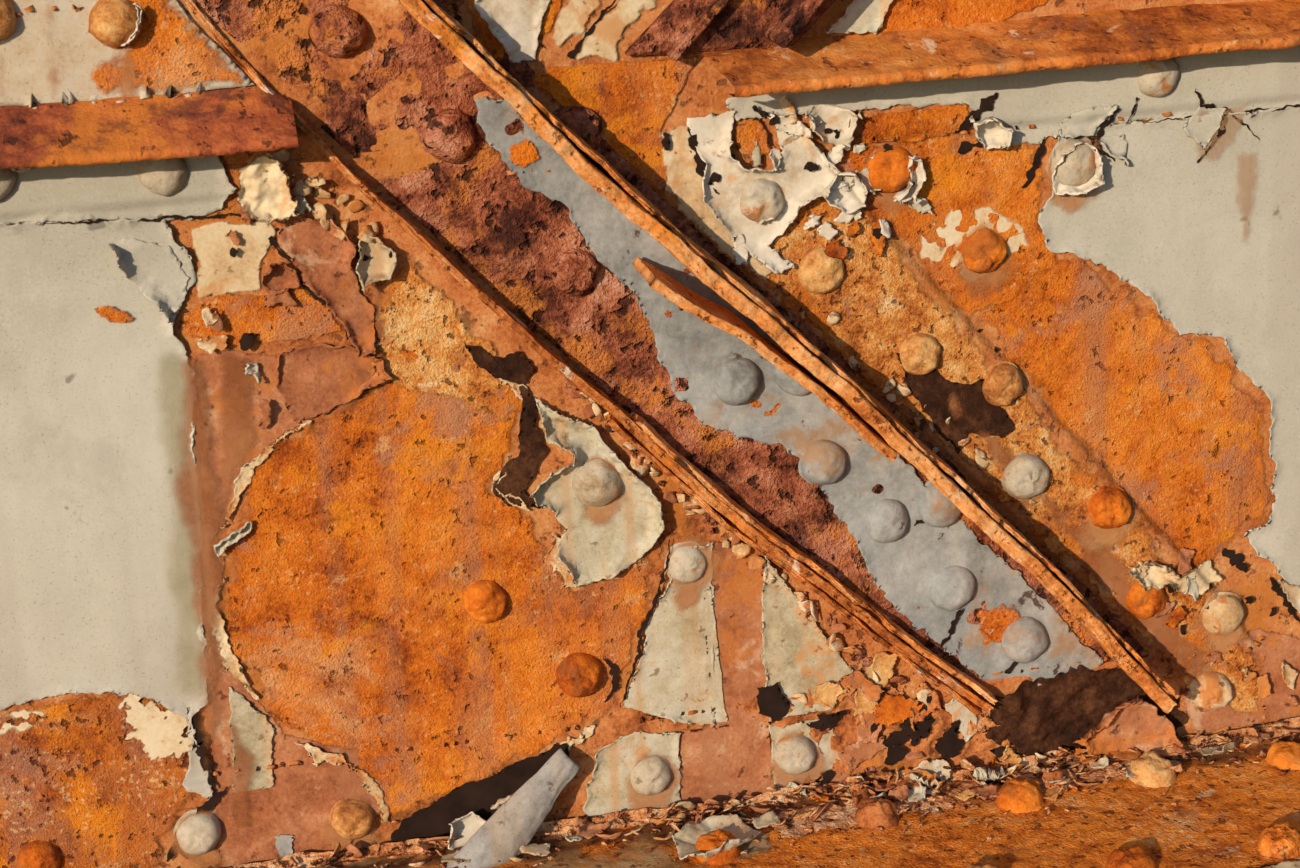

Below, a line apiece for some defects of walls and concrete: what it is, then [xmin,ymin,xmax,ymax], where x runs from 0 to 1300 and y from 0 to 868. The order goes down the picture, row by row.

crack [1022,89,1300,188]
crack [44,213,241,225]
crack [268,235,349,340]
corrosion [424,0,1271,714]
peeling [0,149,680,868]
corrosion [177,256,998,825]
peeling [465,45,1300,863]
corrosion [0,694,217,868]
corrosion [427,846,462,863]
corrosion [516,751,849,861]
corrosion [1074,696,1300,764]
peeling [1268,857,1300,868]